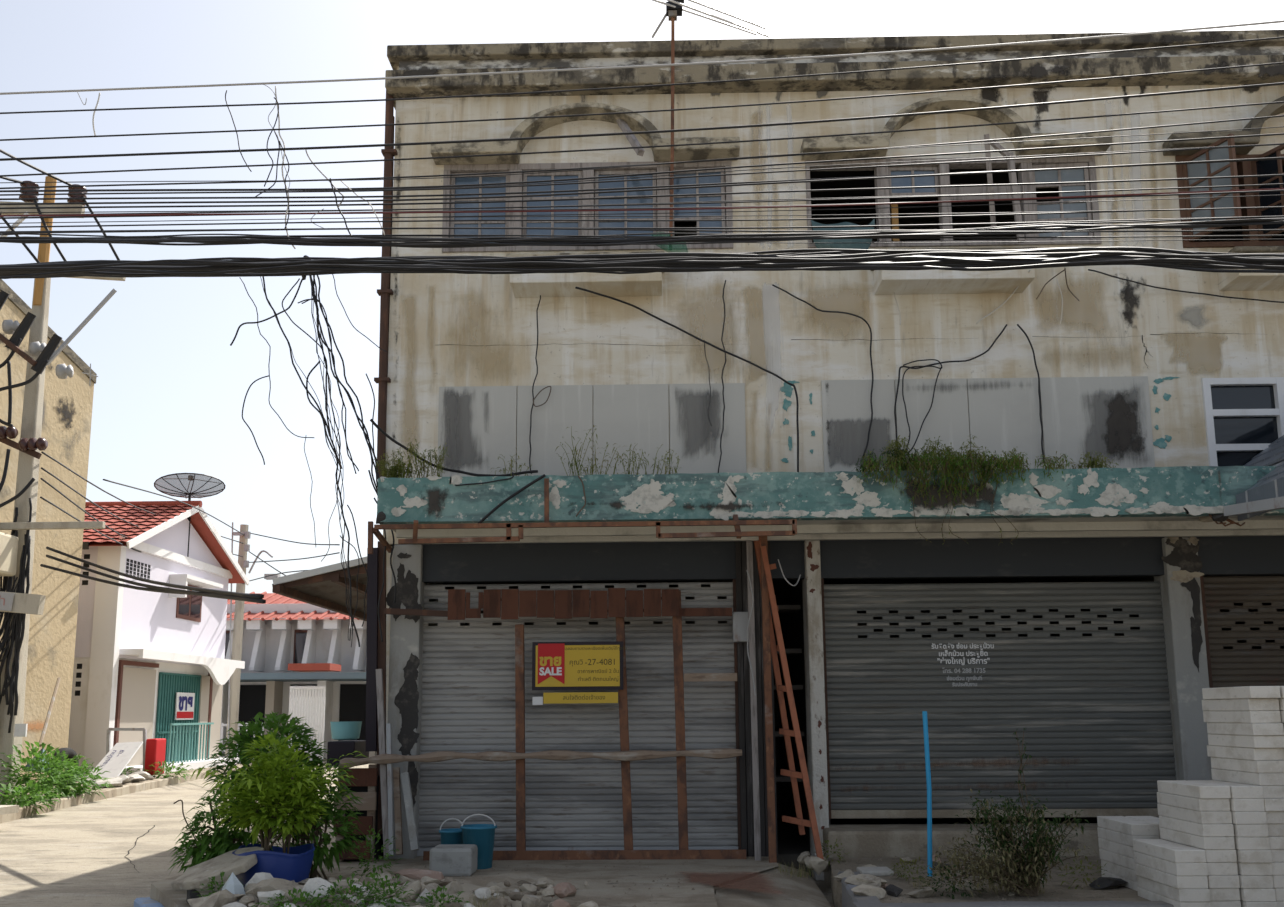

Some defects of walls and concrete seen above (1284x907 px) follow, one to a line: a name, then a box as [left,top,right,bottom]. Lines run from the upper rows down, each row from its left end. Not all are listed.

water stain [981,62,1065,129]
water stain [1120,279,1144,324]
water stain [444,391,482,469]
water stain [676,392,719,454]
water stain [827,419,891,466]
water stain [1086,388,1145,461]
peeling [376,477,428,524]
peeling [619,479,676,514]
peeling [709,467,1245,527]
peeling [386,553,423,623]
peeling [1162,537,1204,672]
peeling [394,653,420,807]